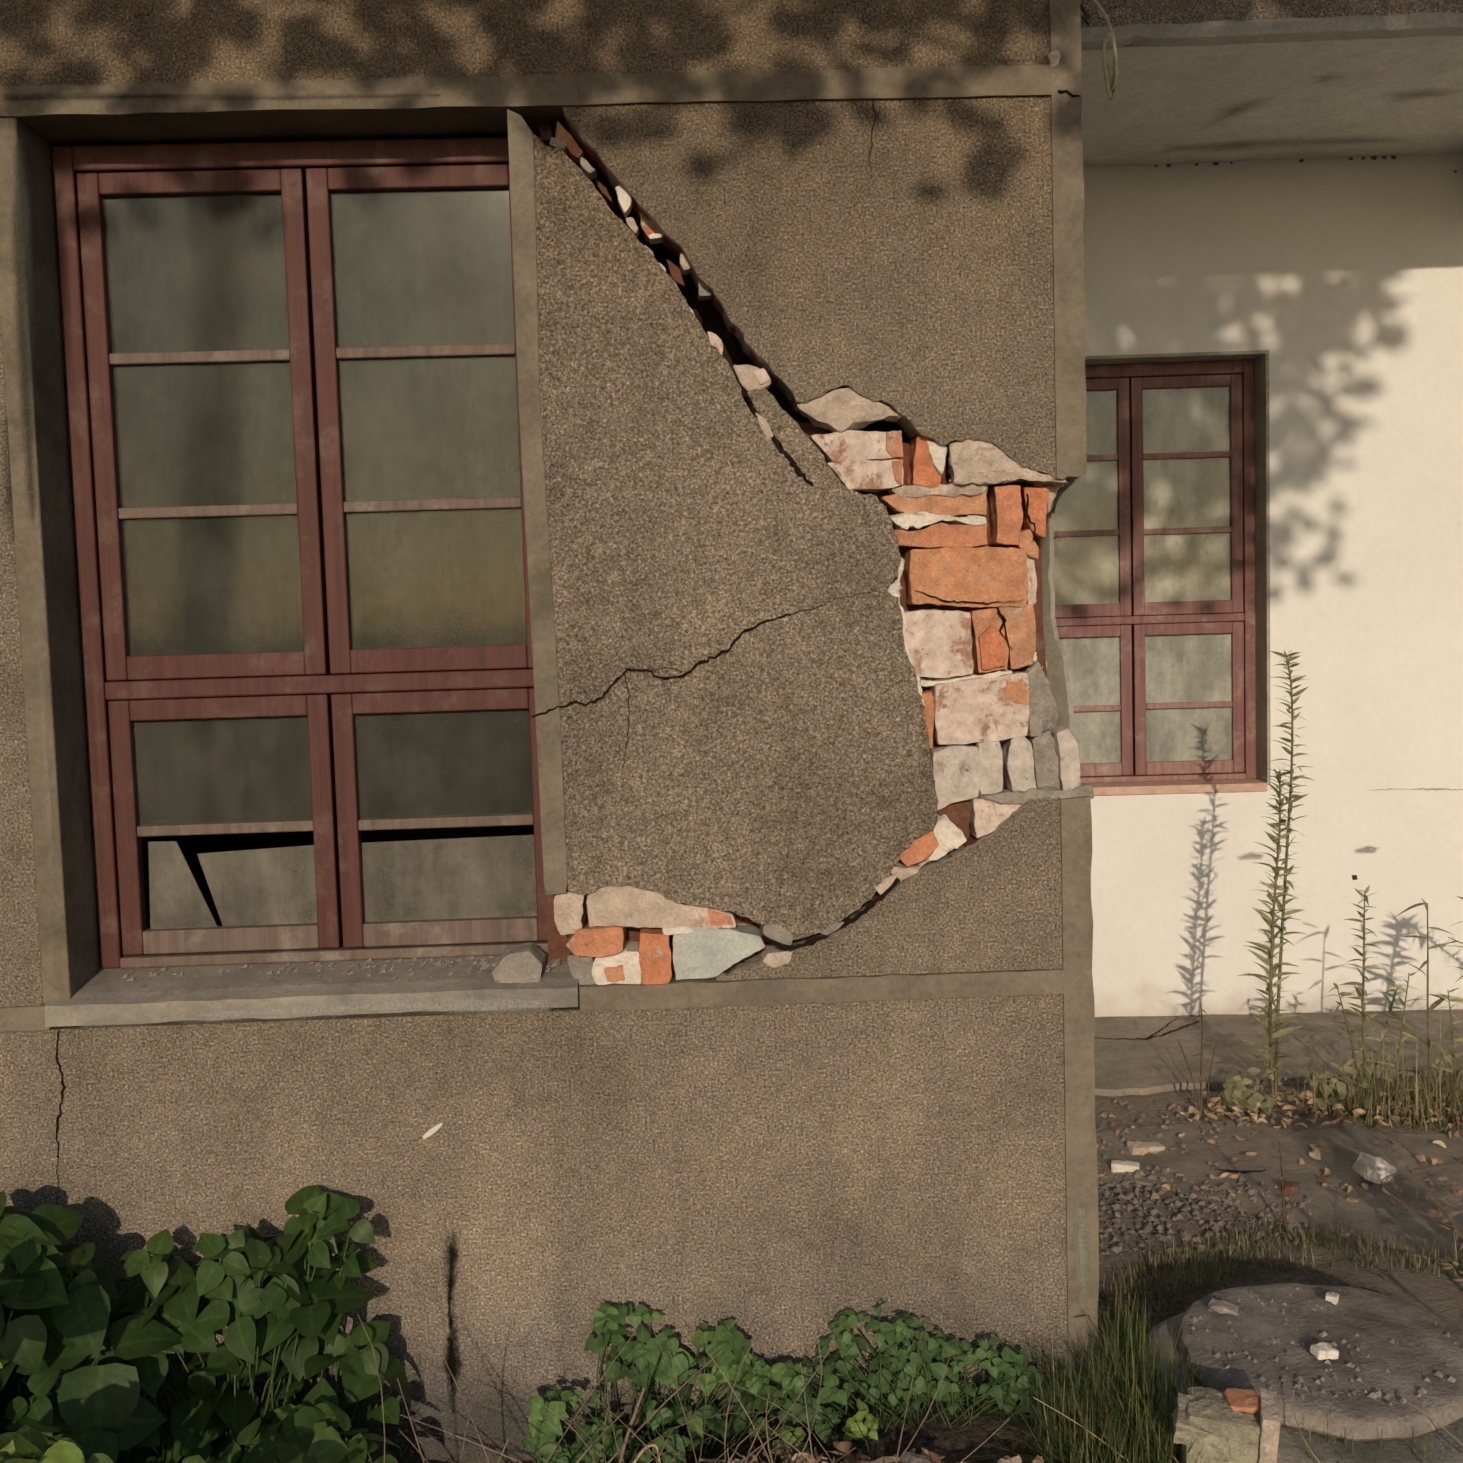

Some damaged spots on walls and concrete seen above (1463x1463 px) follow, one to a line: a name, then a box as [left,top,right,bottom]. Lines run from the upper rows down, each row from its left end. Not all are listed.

crack [531,591,874,774]
flaking render [795,388,1094,882]
flaking render [547,885,793,986]
crack [55,1030,66,1204]
damp [444,1244,461,1402]